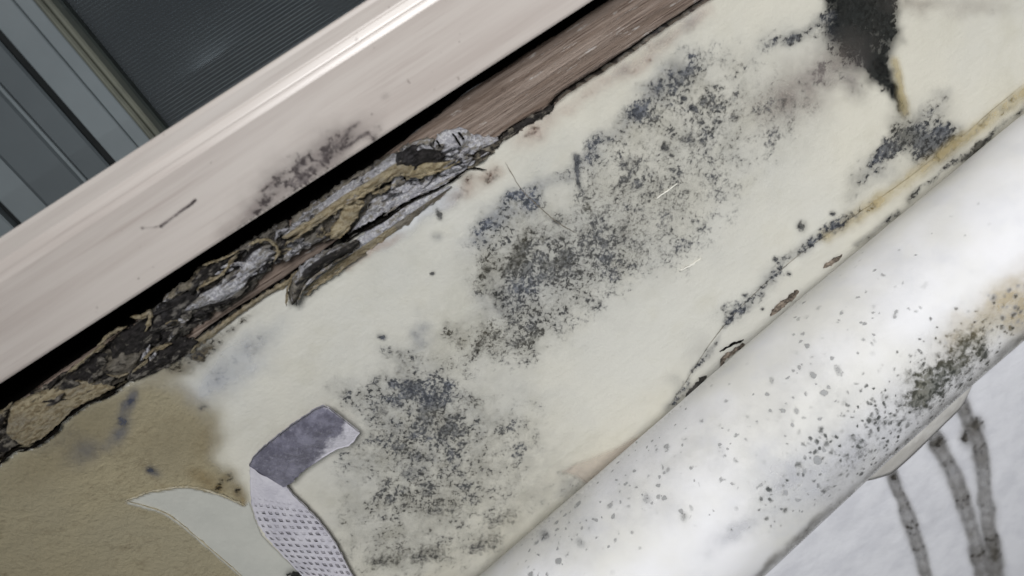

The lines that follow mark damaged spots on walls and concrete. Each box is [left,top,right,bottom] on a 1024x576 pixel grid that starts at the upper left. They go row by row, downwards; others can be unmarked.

leakage [753,0,1024,200]
peeling [0,104,554,456]
mould [334,53,758,573]
leakage [722,196,884,325]
leakage [756,289,1024,512]
leakage [890,472,928,576]
leakage [956,483,1001,576]